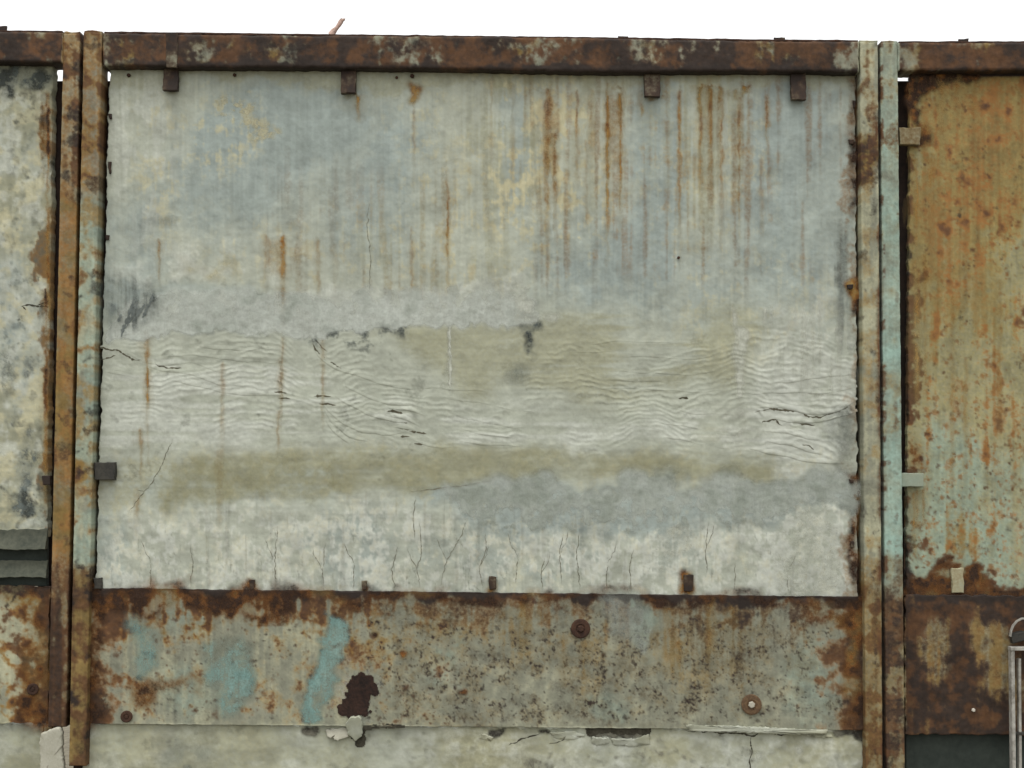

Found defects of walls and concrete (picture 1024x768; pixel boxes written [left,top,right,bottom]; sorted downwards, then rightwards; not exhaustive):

corrosion [905,74,979,142]
corrosion [605,94,622,223]
damp [105,285,556,387]
crack [757,407,848,450]
crack [131,443,172,509]
damp [446,465,861,531]
crack [391,482,580,587]
corrosion [92,580,312,643]
corrosion [679,570,779,609]
corrosion [906,557,1024,597]
spalling [480,728,504,742]
spalling [540,728,663,758]